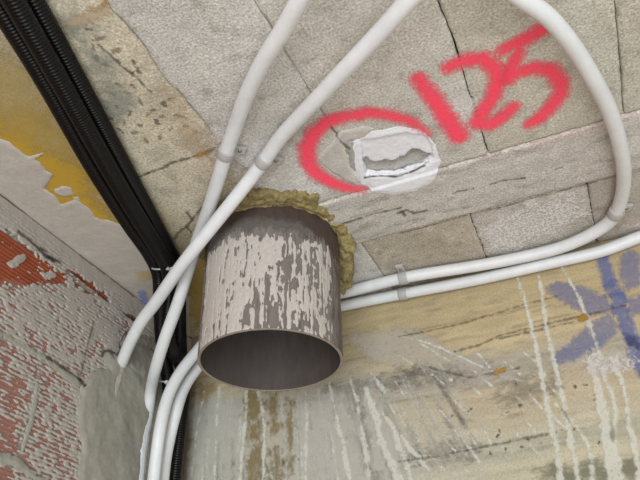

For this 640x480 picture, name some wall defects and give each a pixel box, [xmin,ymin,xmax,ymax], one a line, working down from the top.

crack [99,45,142,83]
crack [139,147,217,178]
spalling [318,126,374,185]
flaking render [0,139,153,480]
flaking render [142,315,155,339]
leakage [188,258,206,327]
leakage [237,390,248,480]
leakage [257,391,267,478]
leakage [329,382,352,480]
leakage [350,380,430,480]
leakage [544,463,608,480]
leakage [621,460,638,474]